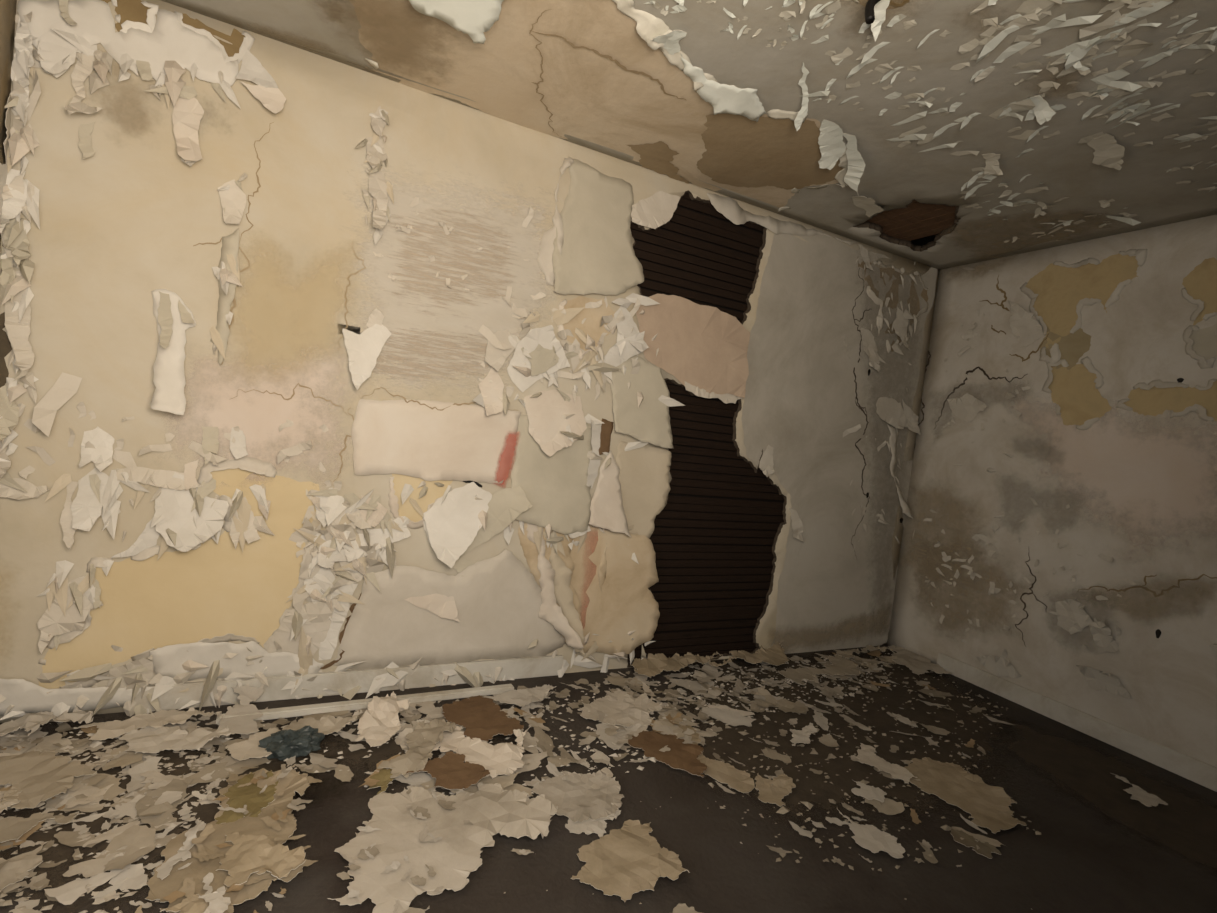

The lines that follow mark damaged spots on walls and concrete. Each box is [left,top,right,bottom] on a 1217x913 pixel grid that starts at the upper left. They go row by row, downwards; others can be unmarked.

peeling [101,0,159,33]
peeling [174,10,255,64]
crack [529,9,686,140]
peeling [350,0,1217,401]
spalling [0,312,12,388]
crack [914,275,1049,449]
peeling [1020,249,1217,430]
peeling [38,440,453,708]
spalling [627,378,787,668]
water stain [910,494,1007,628]
crack [1015,553,1047,645]
crack [1078,574,1217,597]